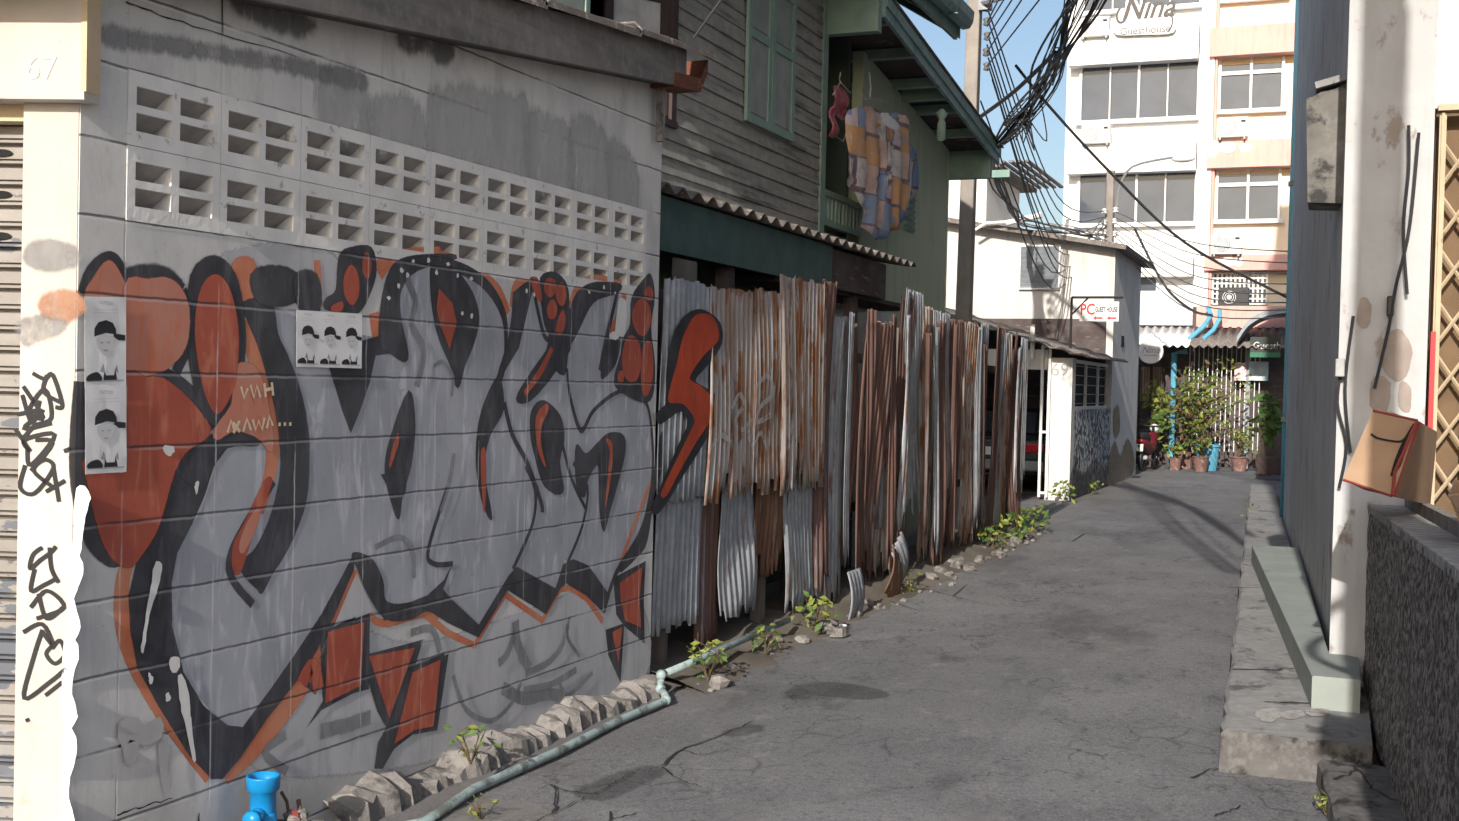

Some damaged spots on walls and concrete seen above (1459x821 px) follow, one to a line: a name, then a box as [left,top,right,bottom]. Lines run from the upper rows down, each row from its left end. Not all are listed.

damp [231,0,316,37]
damp [101,25,639,207]